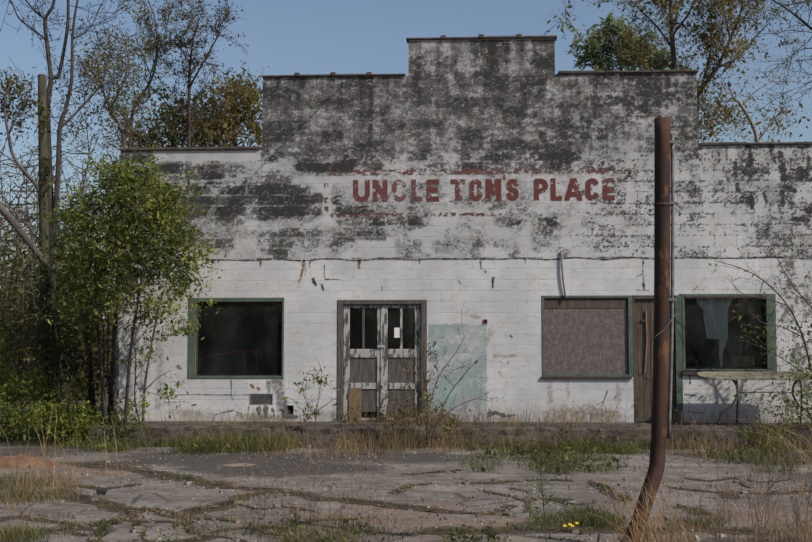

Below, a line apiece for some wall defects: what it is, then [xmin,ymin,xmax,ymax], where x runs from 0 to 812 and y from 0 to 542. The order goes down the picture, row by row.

leakage [262,39,697,181]
leakage [177,205,260,253]
leakage [248,227,330,259]
leakage [724,210,800,257]